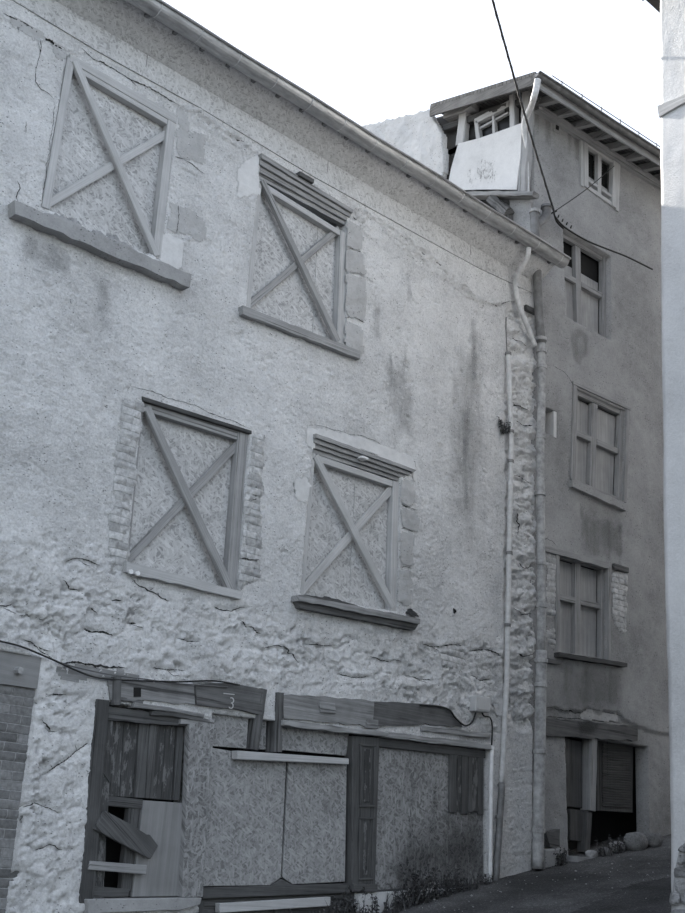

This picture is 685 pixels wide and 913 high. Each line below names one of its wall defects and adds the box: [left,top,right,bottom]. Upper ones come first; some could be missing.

flaking render [167,202,207,242]
flaking render [107,399,146,568]
flaking render [237,433,266,591]
crack [64,558,98,591]
crack [25,640,124,669]
crack [85,599,142,636]
crack [215,607,329,662]
crack [340,657,430,683]
crack [423,644,533,657]
crack [42,743,87,775]